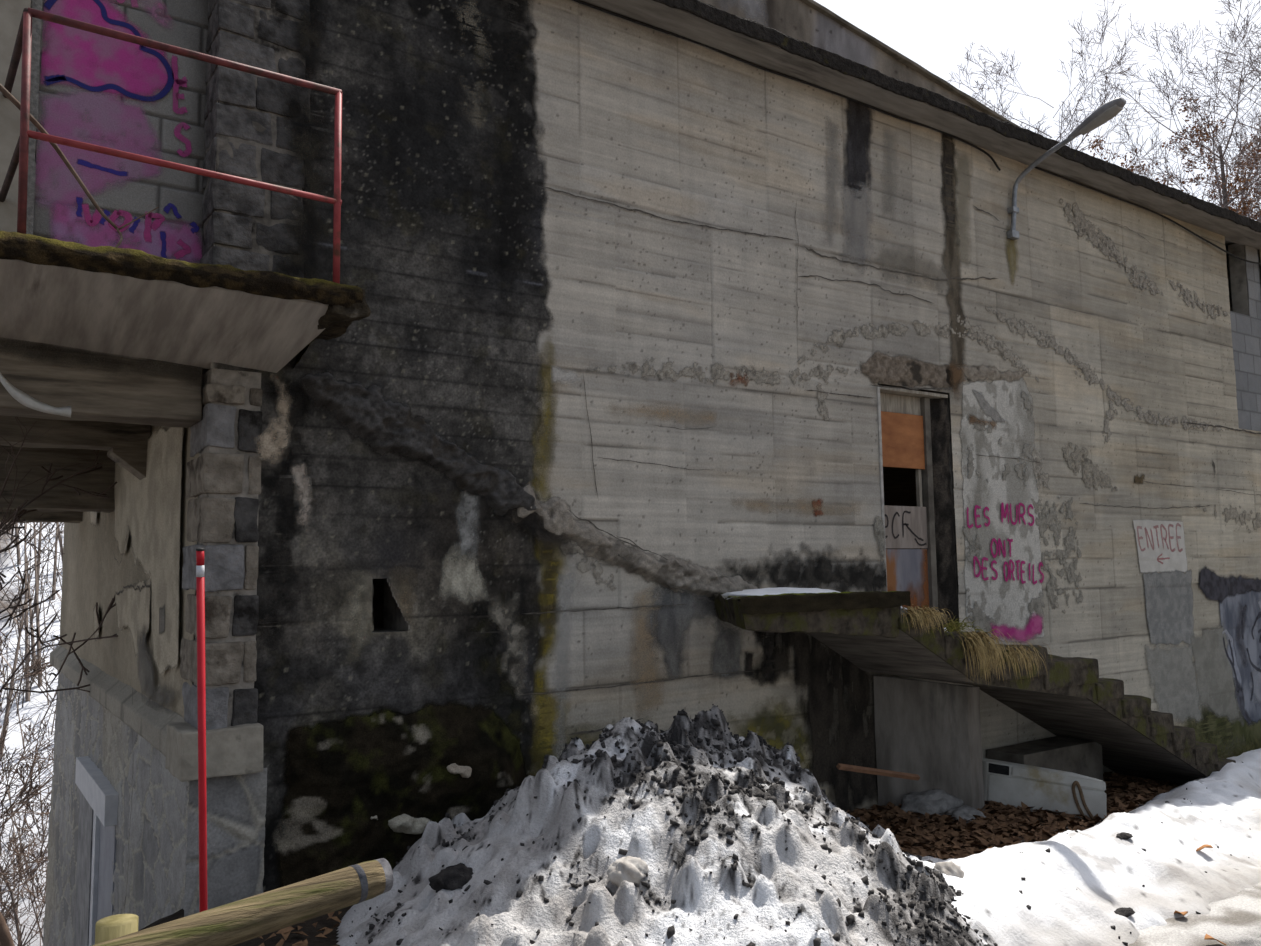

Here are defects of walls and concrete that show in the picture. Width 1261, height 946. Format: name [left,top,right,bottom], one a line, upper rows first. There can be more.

crack [542,187,998,322]
leakage [827,99,970,366]
flaking render [114,427,183,674]
leakage [0,0,578,893]
crack [525,604,685,614]
crack [569,376,714,567]
spalling [961,364,1032,445]